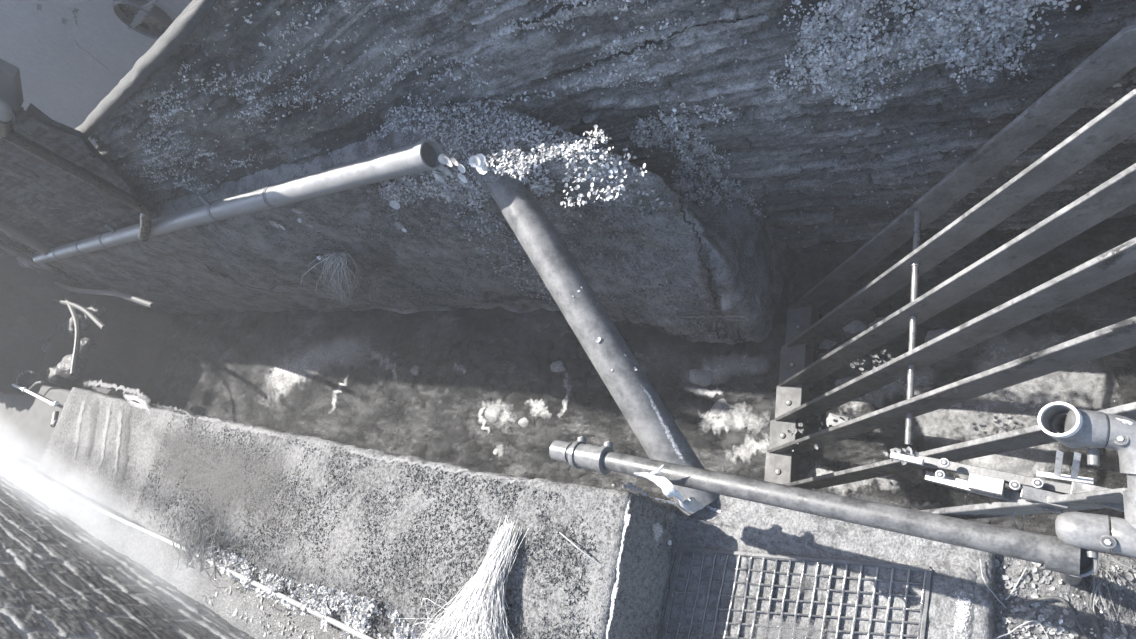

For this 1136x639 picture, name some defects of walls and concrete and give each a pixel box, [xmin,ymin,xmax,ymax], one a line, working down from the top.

leakage [267,341,357,399]
leakage [532,375,571,414]
leakage [686,356,765,397]
leakage [100,408,122,472]
leakage [479,404,508,429]
leakage [704,407,769,460]
leakage [837,476,894,494]